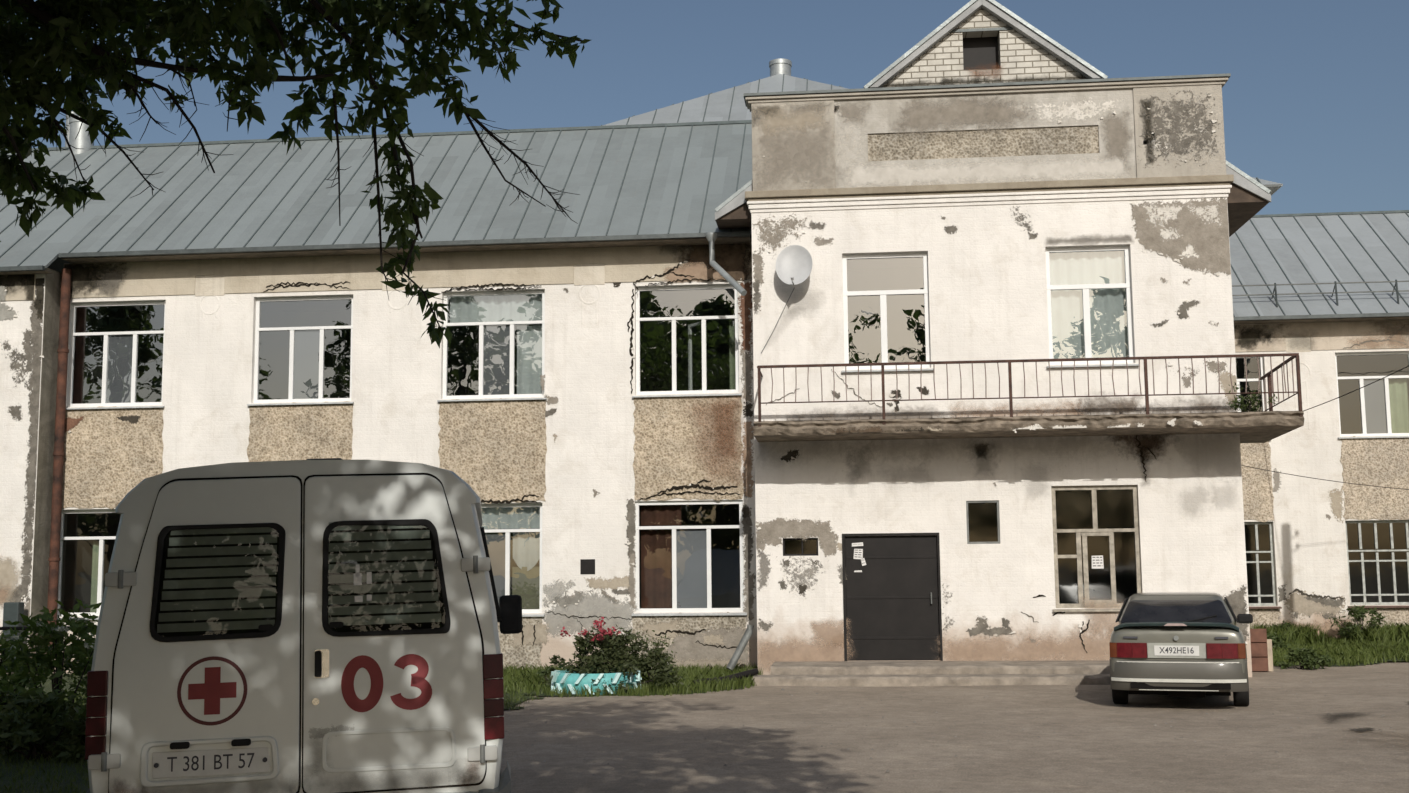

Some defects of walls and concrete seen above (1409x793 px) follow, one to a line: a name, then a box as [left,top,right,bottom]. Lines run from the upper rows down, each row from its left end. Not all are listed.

peeling [1010,90,1222,168]
crack [264,281,350,292]
spalling [1131,197,1231,327]
crack [627,259,726,394]
spalling [887,387,930,412]
peeling [0,278,45,639]
peeling [513,214,847,667]
water stain [1115,435,1167,460]
crack [640,479,740,500]
water stain [0,559,18,604]
spalling [942,585,1035,643]
spalling [1278,584,1351,620]